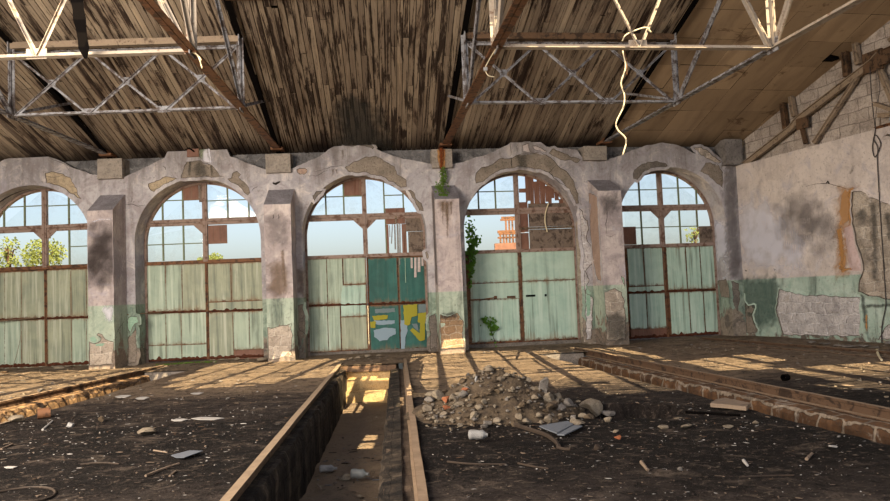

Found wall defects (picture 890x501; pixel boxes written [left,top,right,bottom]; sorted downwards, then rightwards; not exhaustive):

spalling [42,168,84,202]
spalling [145,147,254,198]
spalling [341,144,426,214]
water stain [715,168,803,275]
corrosion [835,188,853,273]
peeling [425,310,465,353]
spalling [472,141,890,445]
water stain [744,279,776,325]
spalling [0,313,188,423]